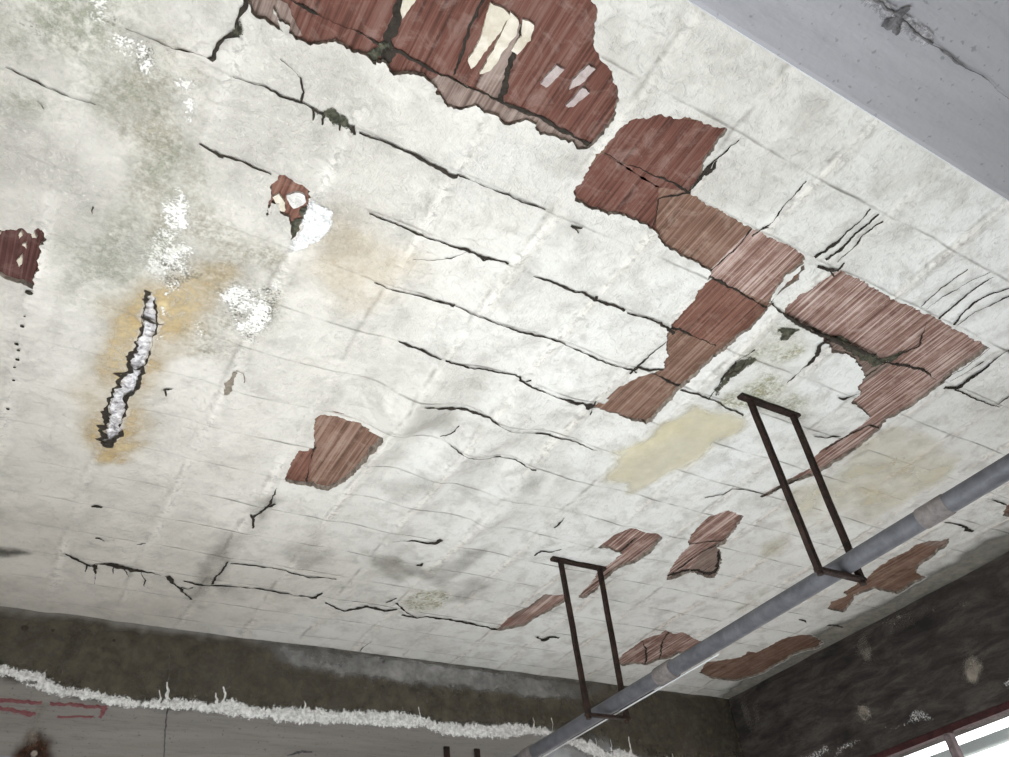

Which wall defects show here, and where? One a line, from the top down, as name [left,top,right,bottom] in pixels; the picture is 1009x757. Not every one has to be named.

crack [5,67,96,109]
crack [687,140,739,194]
spalling [250,0,804,420]
crack [752,181,807,237]
spalling [0,228,45,295]
corrosion [100,278,209,380]
spalling [785,270,986,480]
corrosion [86,410,137,463]
spalling [286,411,380,486]
leakage [609,378,774,488]
spalling [668,510,741,577]
crack [65,538,498,630]